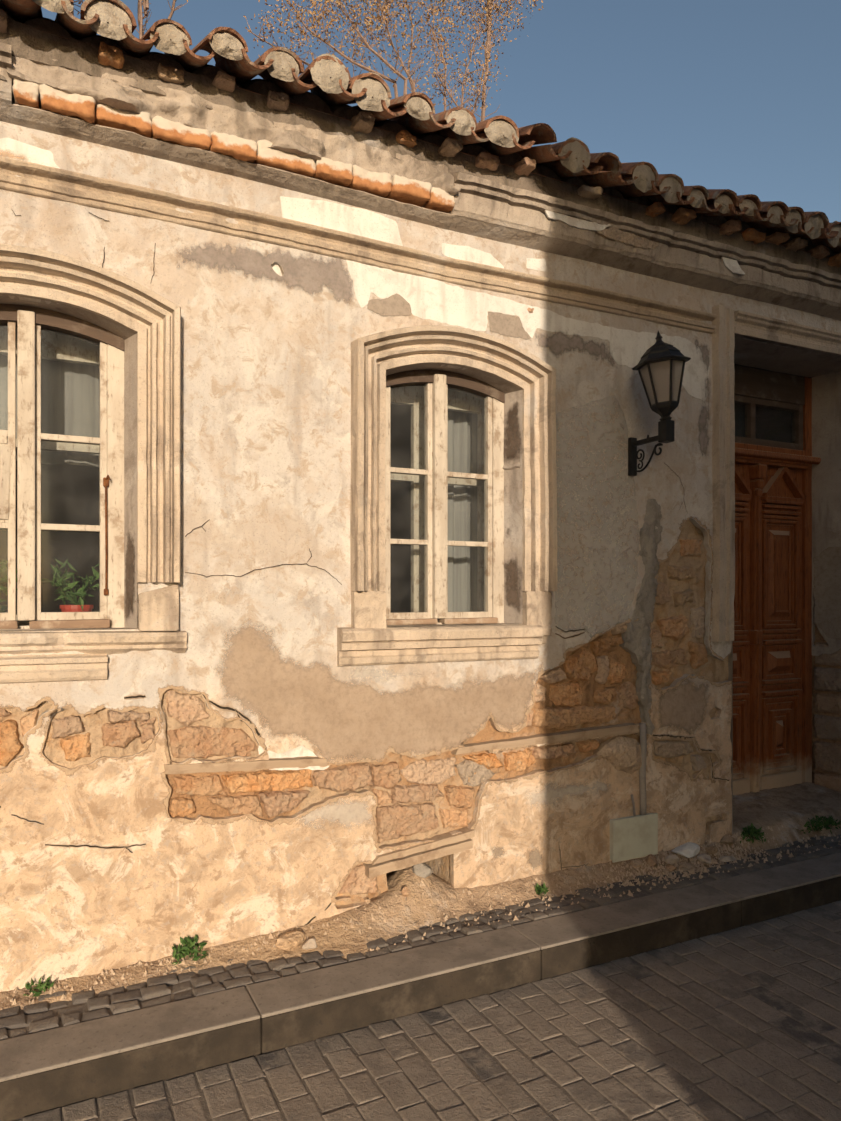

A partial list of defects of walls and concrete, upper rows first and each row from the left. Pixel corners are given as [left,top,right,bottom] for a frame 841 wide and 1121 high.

flaking render [0,75,455,213]
peeling [280,196,403,246]
peeling [526,258,547,271]
peeling [346,260,710,401]
crack [185,519,210,537]
crack [185,549,342,585]
peeling [0,516,732,906]
crack [0,805,146,853]